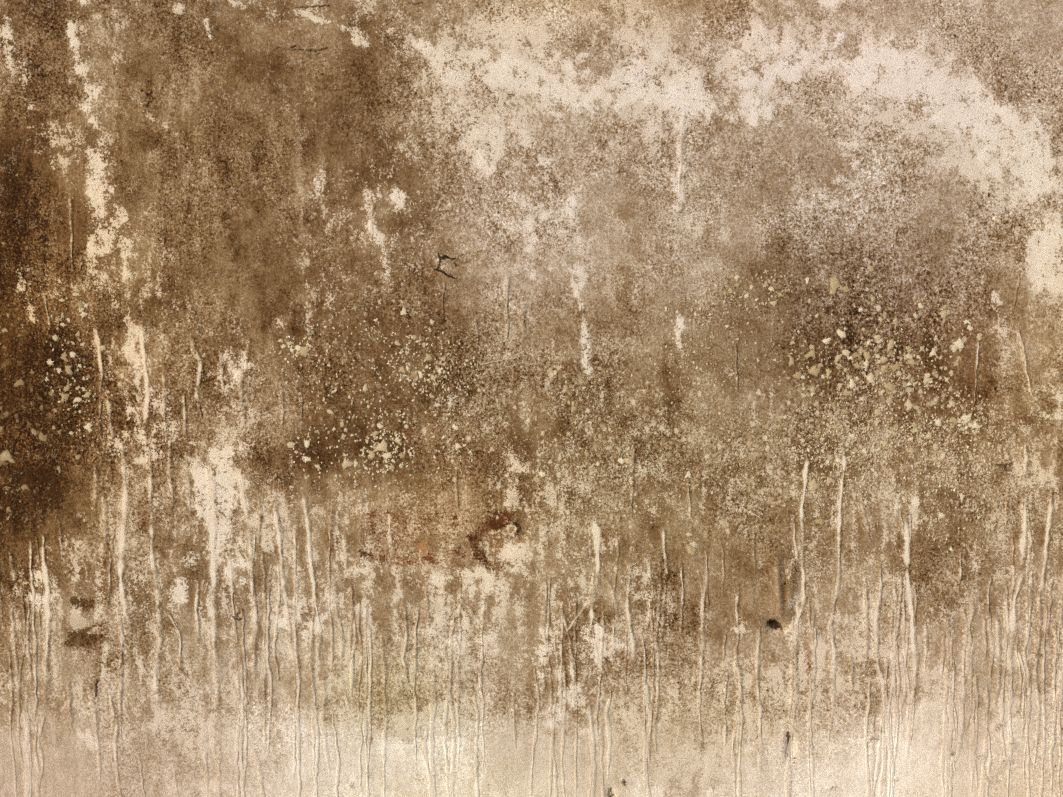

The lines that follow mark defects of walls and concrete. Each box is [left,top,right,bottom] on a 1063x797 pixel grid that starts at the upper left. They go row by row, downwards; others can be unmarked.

efflorescence [360,182,409,279]
crack [434,252,456,279]
water stain [406,0,1063,339]
water stain [706,131,1063,435]
efflorescence [136,320,169,446]
efflorescence [148,391,190,516]
water stain [0,601,36,797]
water stain [28,522,126,797]
efflorescence [203,460,227,706]
rust [322,502,339,552]
rust [353,502,522,574]
water stain [417,540,532,676]